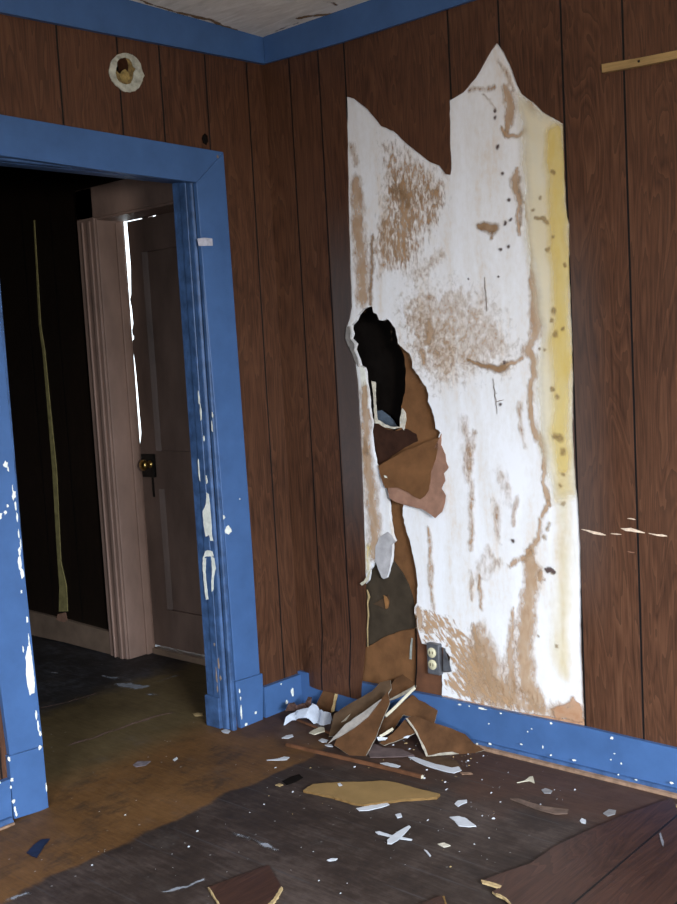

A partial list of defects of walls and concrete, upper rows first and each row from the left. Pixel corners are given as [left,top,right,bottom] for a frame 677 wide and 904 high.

leakage [351,144,442,305]
leakage [416,70,574,717]
peeling [0,485,24,578]
peeling [198,459,216,600]
spalling [345,307,449,696]